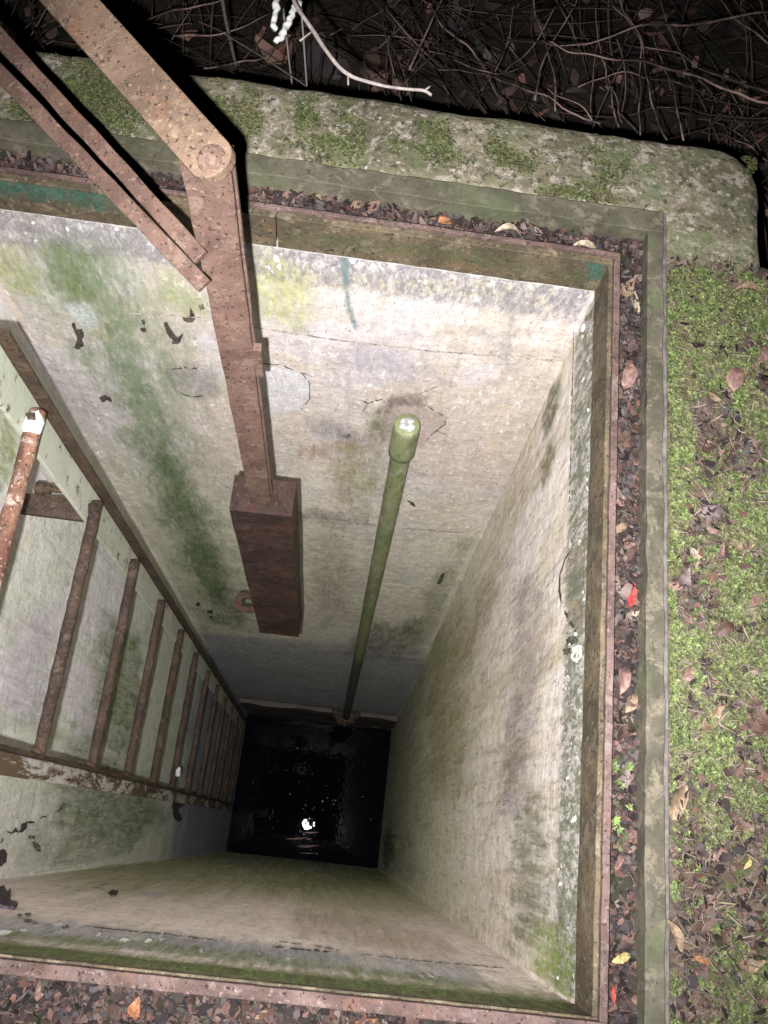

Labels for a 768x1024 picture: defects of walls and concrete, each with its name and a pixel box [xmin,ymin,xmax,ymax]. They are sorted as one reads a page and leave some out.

peeling [69,307,96,350]
peeling [164,304,204,344]
spalling [172,802,184,822]